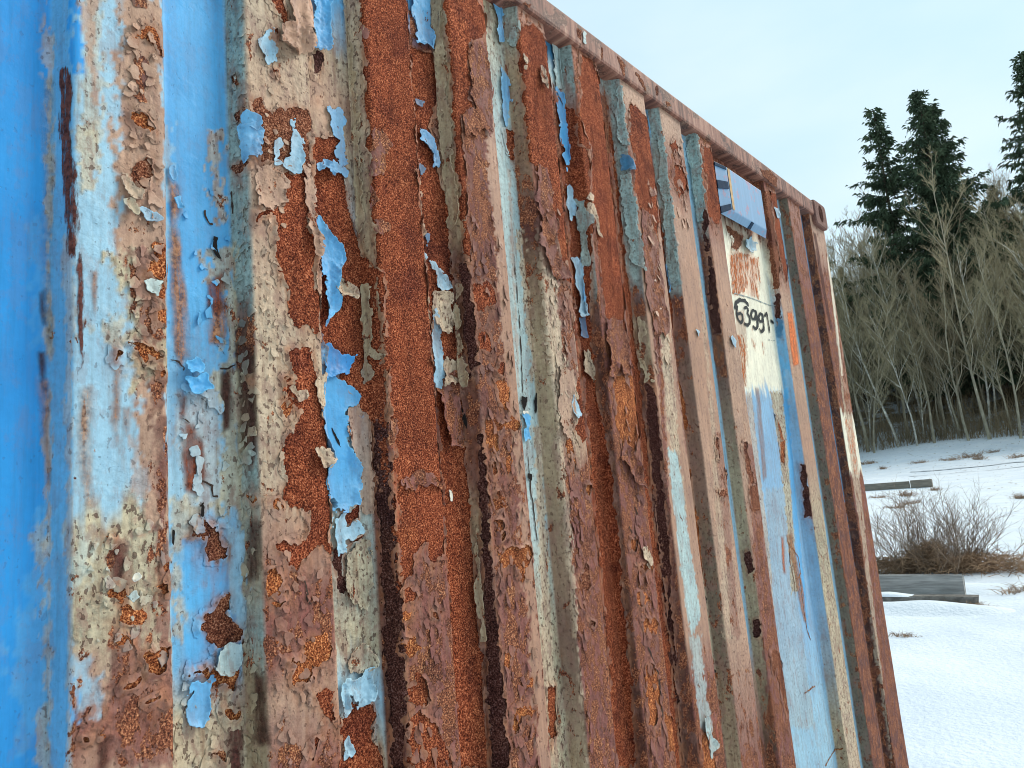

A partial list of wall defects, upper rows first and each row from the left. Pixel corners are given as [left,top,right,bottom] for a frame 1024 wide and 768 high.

corrosion [58,66,96,364]
peeling [120,23,188,371]
corrosion [182,591,269,768]
peeling [189,201,290,535]
peeling [275,568,326,658]
peeling [276,711,326,765]
peeling [234,105,386,611]
corrosion [221,0,560,768]
corrosion [501,2,718,768]
corrosion [698,142,799,366]
corrosion [743,550,756,576]
corrosion [774,408,812,521]